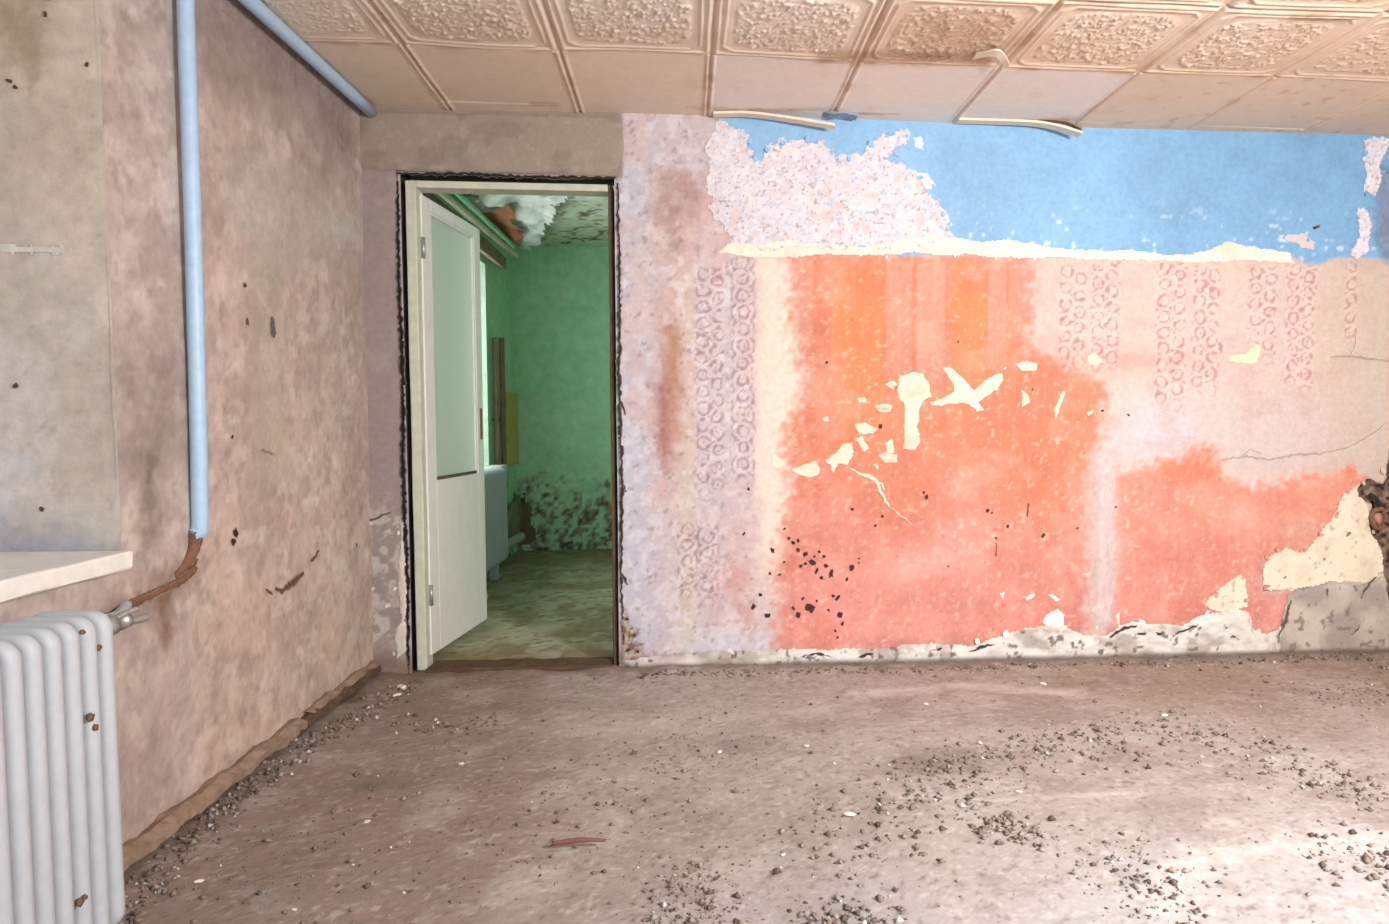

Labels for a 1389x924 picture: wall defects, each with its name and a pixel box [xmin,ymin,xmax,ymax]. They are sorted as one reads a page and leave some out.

peeling [705,121,1316,264]
peeling [1350,136,1389,260]
peeling [772,361,1037,477]
peeling [1054,392,1065,420]
peeling [1087,352,1104,366]
peeling [1218,343,1261,364]
flaking render [621,461,1389,668]